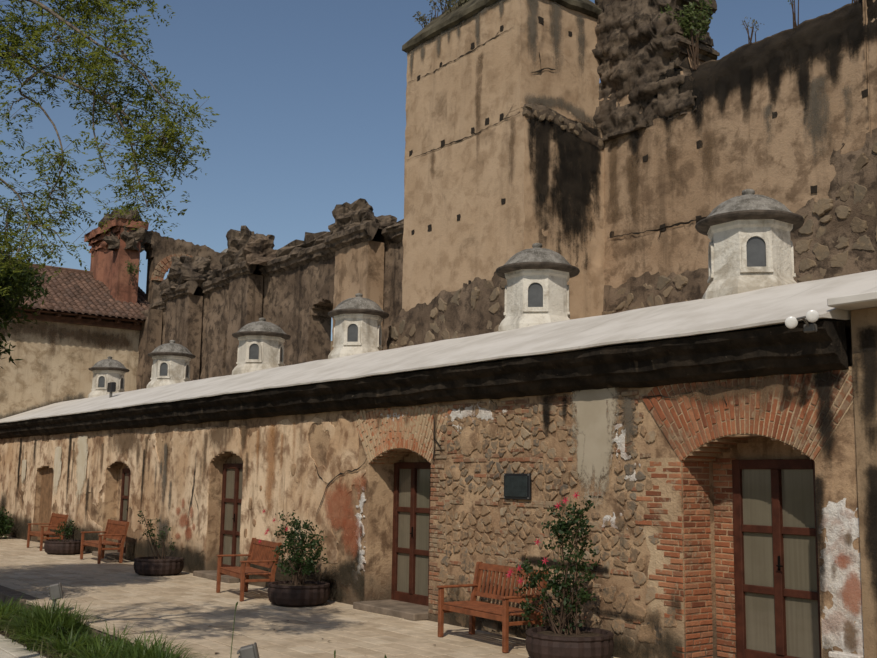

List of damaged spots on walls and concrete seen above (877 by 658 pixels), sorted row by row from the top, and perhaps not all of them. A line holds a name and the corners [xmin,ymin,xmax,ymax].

water stain [527,0,538,58]
water stain [551,2,561,69]
water stain [577,15,585,62]
water stain [654,0,877,176]
water stain [526,96,639,253]
flaking render [790,128,877,283]
crack [314,458,367,516]
flaking render [325,479,366,600]
flaking render [442,401,508,454]
flaking render [821,498,864,655]
water stain [852,327,877,443]
water stain [865,465,877,595]